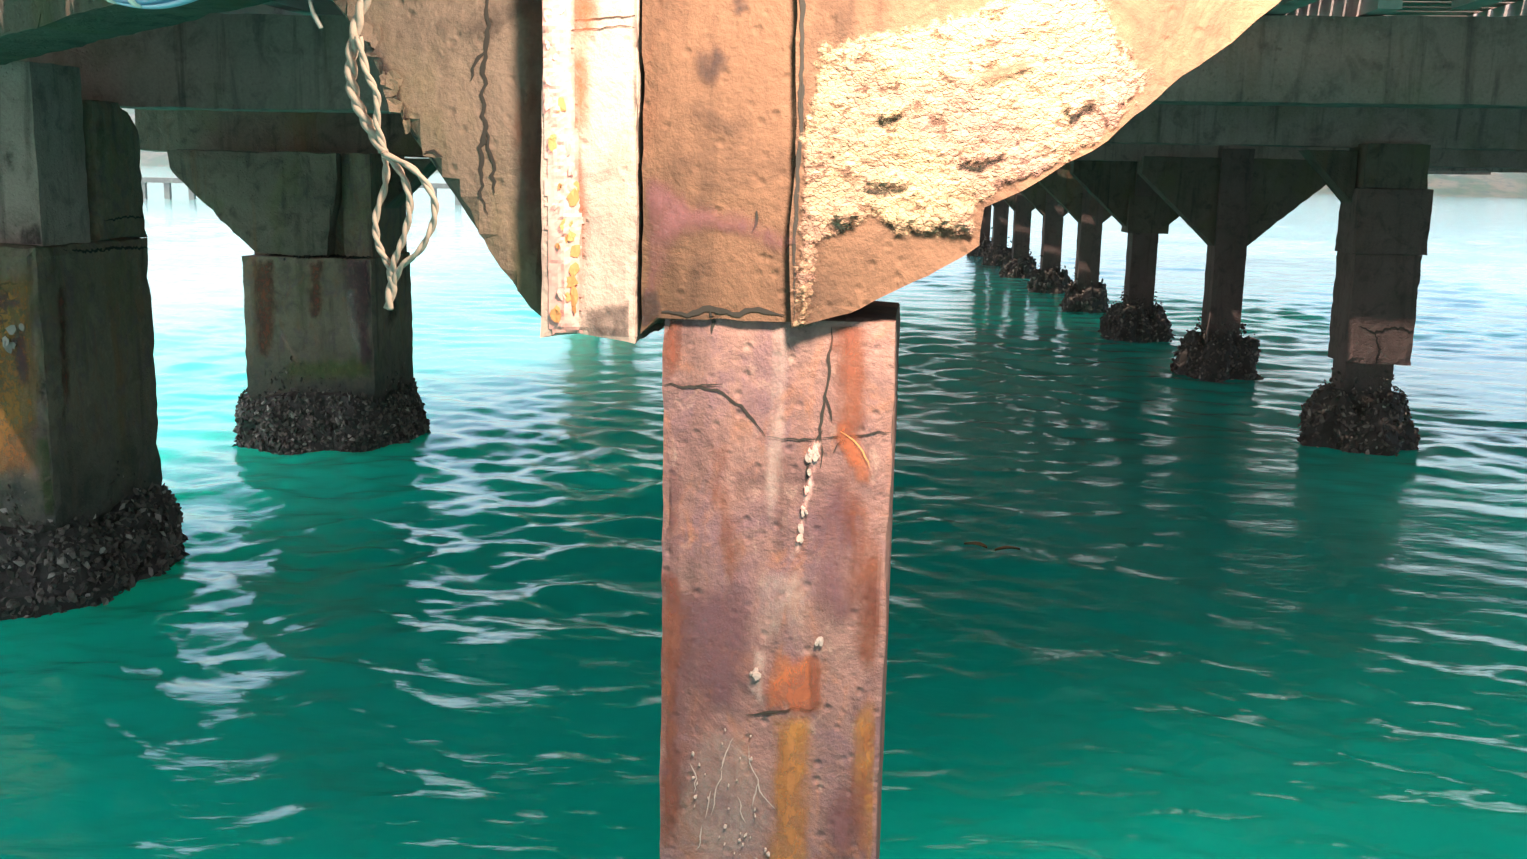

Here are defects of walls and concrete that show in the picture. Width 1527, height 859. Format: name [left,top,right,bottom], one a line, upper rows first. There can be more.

crack [404,0,496,214]
peeling [542,0,586,335]
crack [662,0,806,333]
spalling [792,0,1152,329]
rust [0,281,38,472]
rust [255,261,276,356]
crack [665,327,890,486]
crack [1360,326,1414,363]
rust [770,658,821,859]